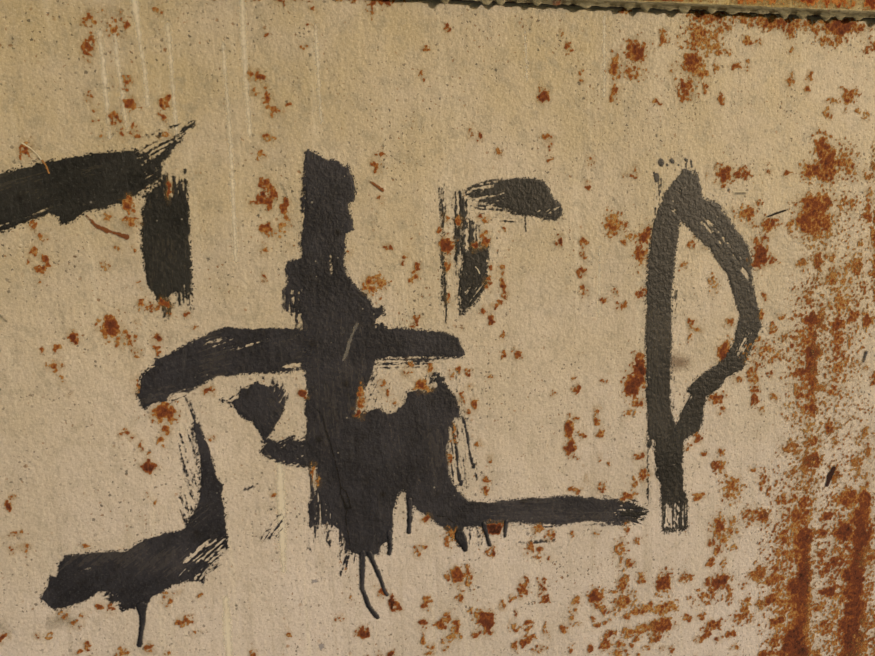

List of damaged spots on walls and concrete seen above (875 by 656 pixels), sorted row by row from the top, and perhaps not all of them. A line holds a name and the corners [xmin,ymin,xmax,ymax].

corrosion [81,9,131,62]
corrosion [335,0,406,21]
corrosion [604,0,875,103]
corrosion [86,75,142,138]
corrosion [822,86,870,119]
corrosion [250,177,292,252]
corrosion [26,220,51,283]
corrosion [39,332,79,382]
corrosion [95,310,142,358]
corrosion [119,401,181,475]
corrosion [374,585,402,612]
corrosion [354,625,370,639]